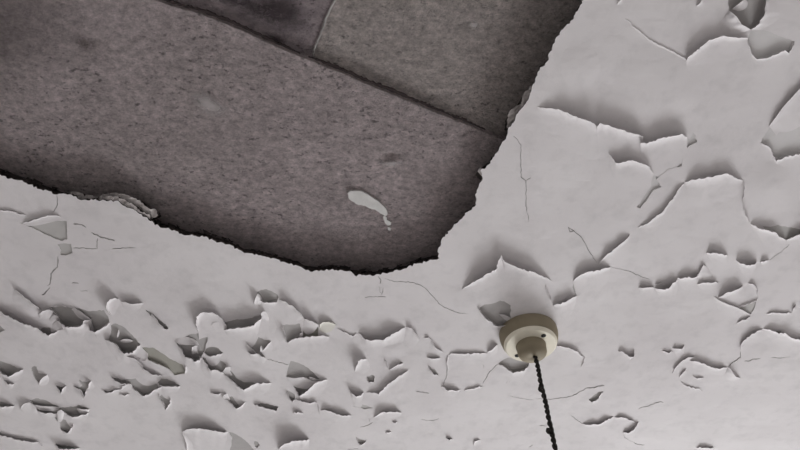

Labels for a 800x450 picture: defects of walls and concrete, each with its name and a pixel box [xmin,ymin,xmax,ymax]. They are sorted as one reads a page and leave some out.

peeling [627,0,795,67]
flaking render [0,0,583,276]
peeling [537,107,697,208]
peeling [760,89,800,168]
crack [75,223,131,249]
peeling [639,173,800,254]
crack [365,276,466,314]
peeling [462,235,631,333]
peeling [639,252,769,326]
peeling [0,289,529,450]
peeling [662,345,740,391]
peeling [740,328,800,358]